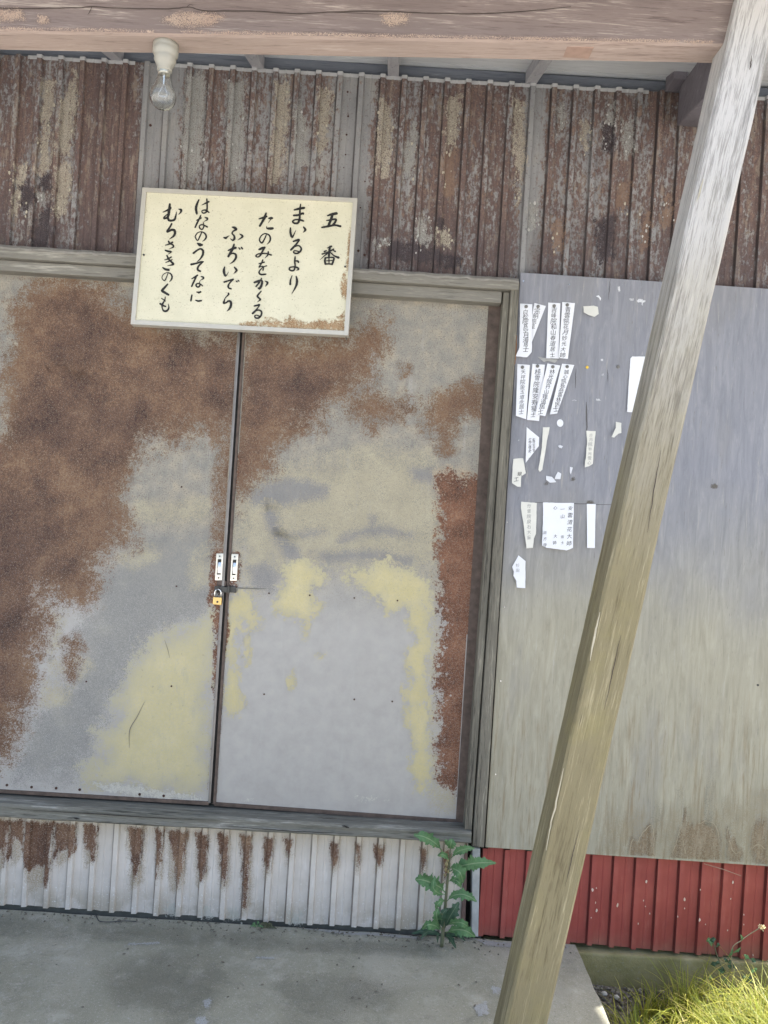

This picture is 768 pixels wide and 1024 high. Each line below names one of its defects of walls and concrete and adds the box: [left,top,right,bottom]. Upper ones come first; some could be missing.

peeling [7,68,80,221]
peeling [177,69,248,187]
peeling [267,75,335,187]
peeling [373,98,421,183]
peeling [441,92,466,157]
peeling [510,93,541,232]
peeling [553,100,638,161]
peeling [414,213,454,255]
corrosion [0,230,484,797]
corrosion [0,817,102,893]
corrosion [124,825,295,916]
corrosion [328,839,387,877]